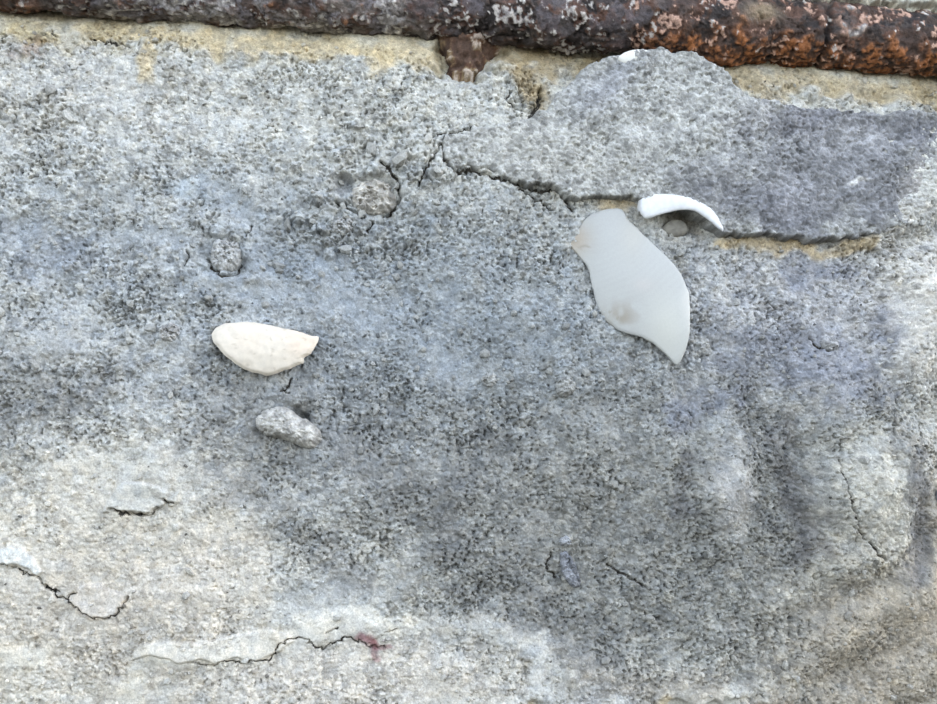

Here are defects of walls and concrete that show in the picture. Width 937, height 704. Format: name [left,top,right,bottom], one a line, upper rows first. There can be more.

corrosion [0,0,937,114]
crack [336,126,573,233]
crack [1,564,129,619]
crack [197,627,397,666]